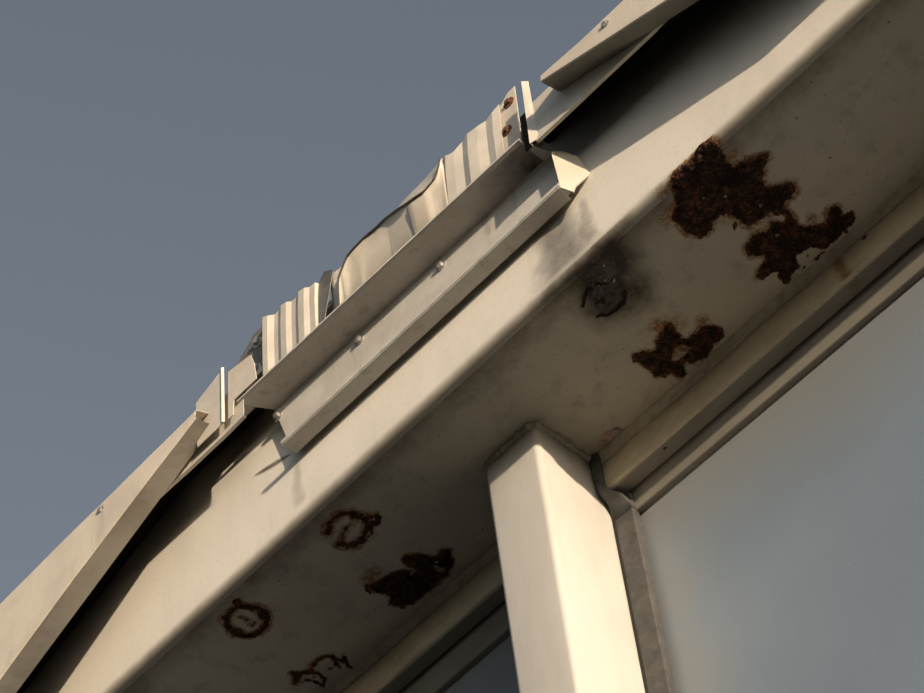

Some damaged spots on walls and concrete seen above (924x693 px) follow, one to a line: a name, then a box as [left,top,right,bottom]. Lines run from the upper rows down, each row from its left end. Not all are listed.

corrosion [661,136,856,284]
water stain [546,220,579,273]
corrosion [631,317,724,379]
corrosion [320,509,382,551]
corrosion [362,548,455,609]
corrosion [219,598,273,640]
corrosion [288,654,354,688]